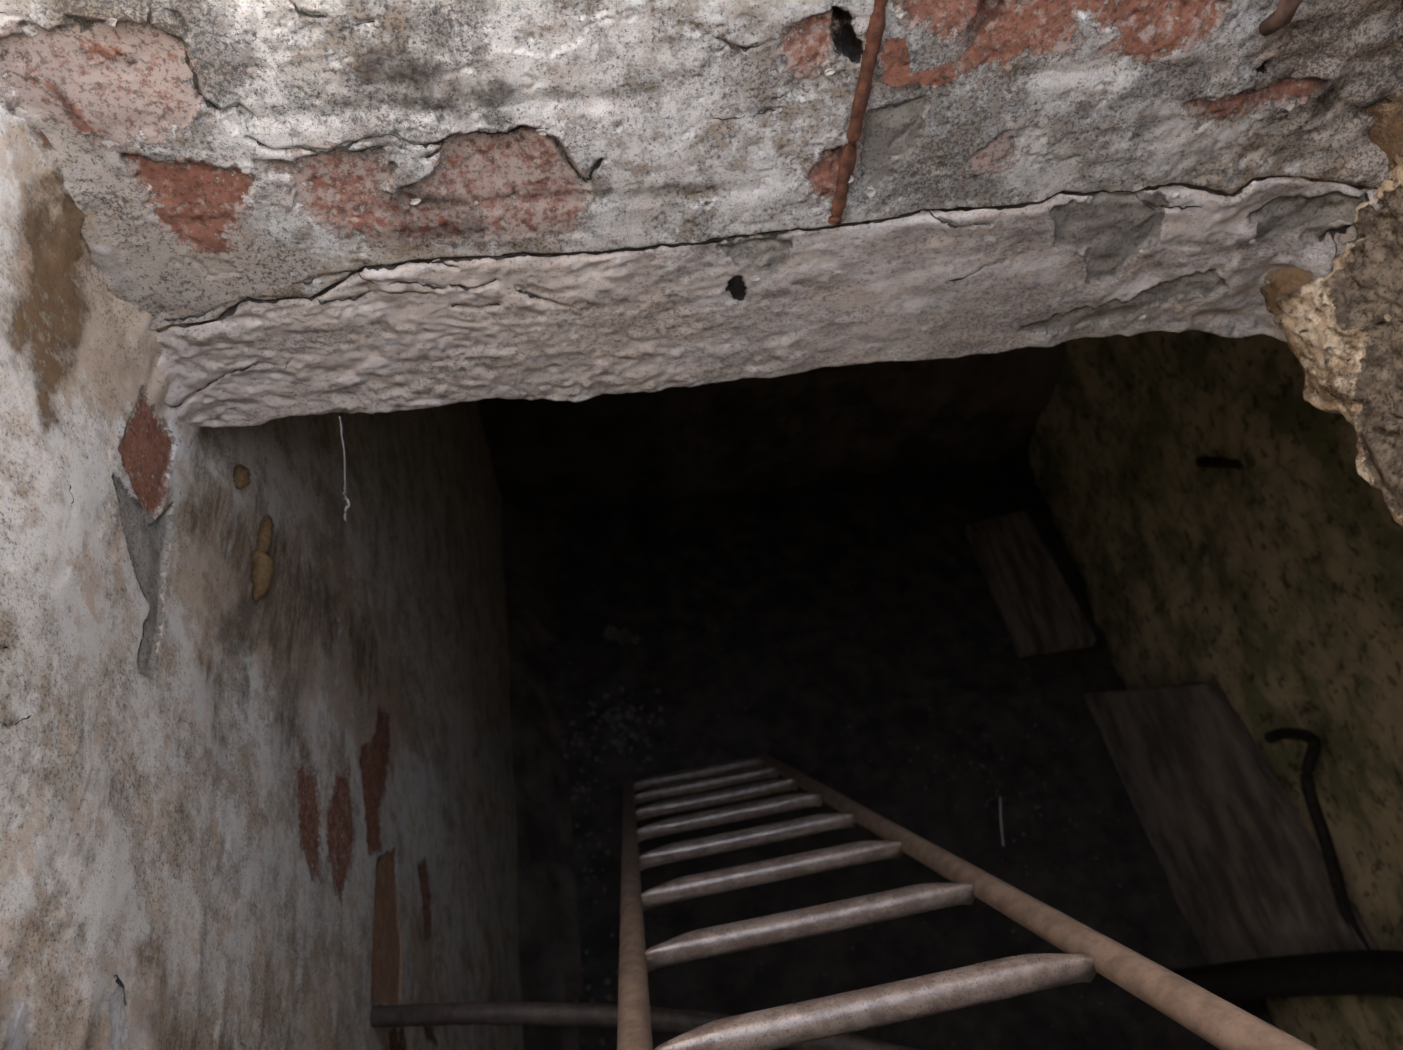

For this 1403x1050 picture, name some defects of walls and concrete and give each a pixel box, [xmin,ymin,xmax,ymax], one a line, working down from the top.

spalling [0,6,595,263]
rust [828,0,888,226]
spalling [803,0,1239,205]
rust [1259,0,1303,37]
crack [156,176,1375,332]
peeling [1246,185,1403,521]
peeling [112,385,183,681]
peeling [295,705,403,1006]
spalling [417,857,432,946]